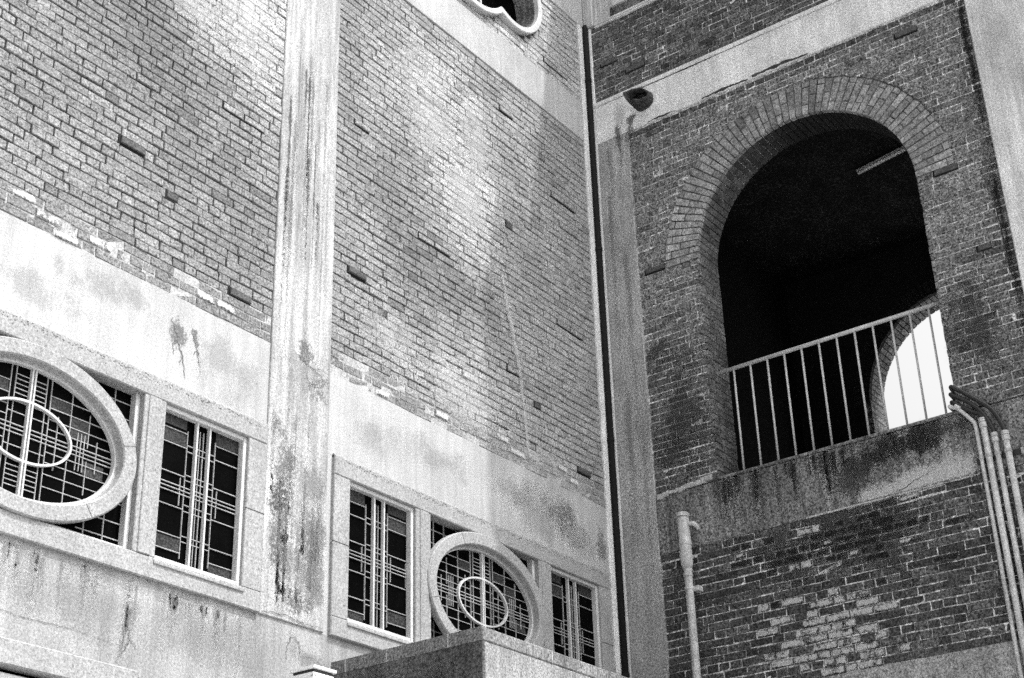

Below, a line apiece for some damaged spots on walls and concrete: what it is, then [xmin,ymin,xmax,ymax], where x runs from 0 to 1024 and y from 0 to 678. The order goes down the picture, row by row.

water stain [282,70,319,266]
water stain [715,461,798,524]
water stain [731,416,980,584]
water stain [757,577,898,676]